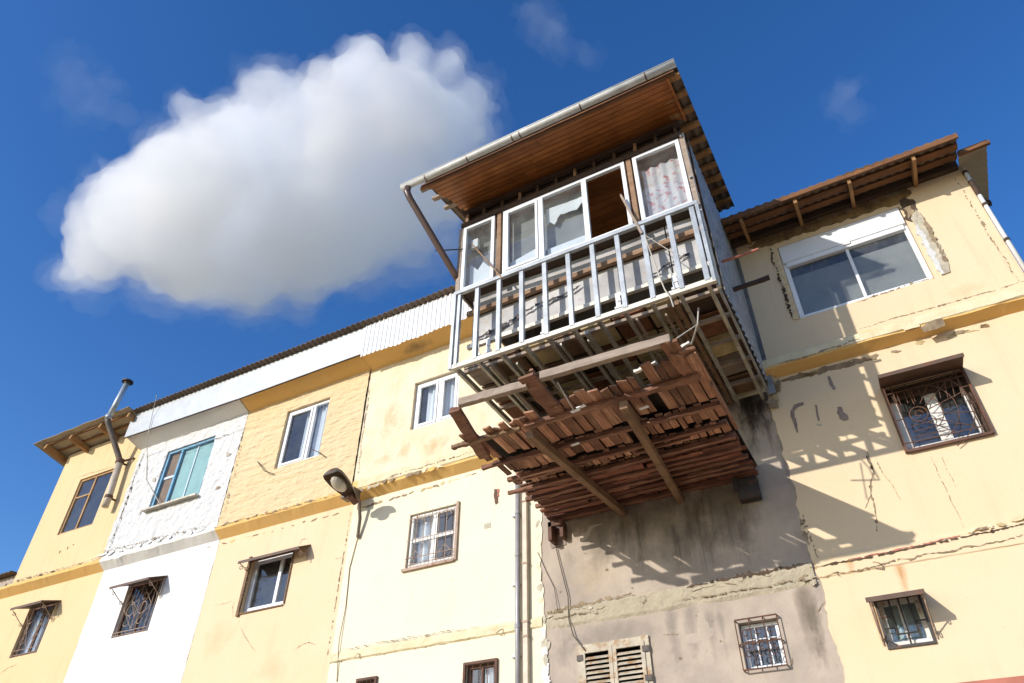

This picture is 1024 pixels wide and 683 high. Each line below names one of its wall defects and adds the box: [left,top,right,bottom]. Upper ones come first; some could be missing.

crack [770,248,793,318]
spalling [749,188,950,320]
spalling [902,318,990,345]
spalling [766,350,901,433]
crack [682,450,1024,599]